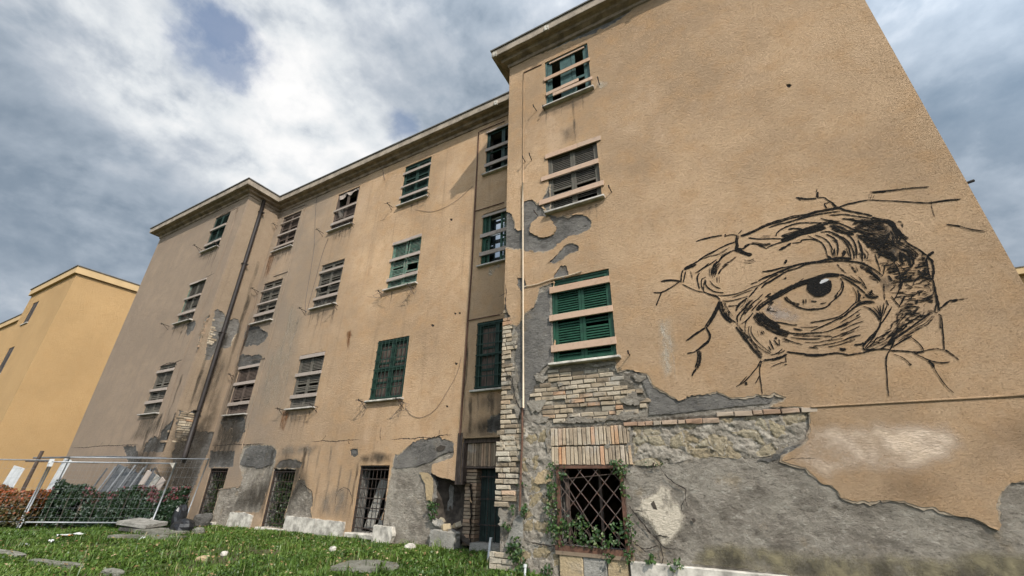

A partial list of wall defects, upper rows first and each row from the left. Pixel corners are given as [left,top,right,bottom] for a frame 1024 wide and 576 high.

flaking render [506,184,592,287]
flaking render [186,308,268,368]
flaking render [530,360,651,423]
flaking render [208,416,313,526]
spalling [428,473,474,545]